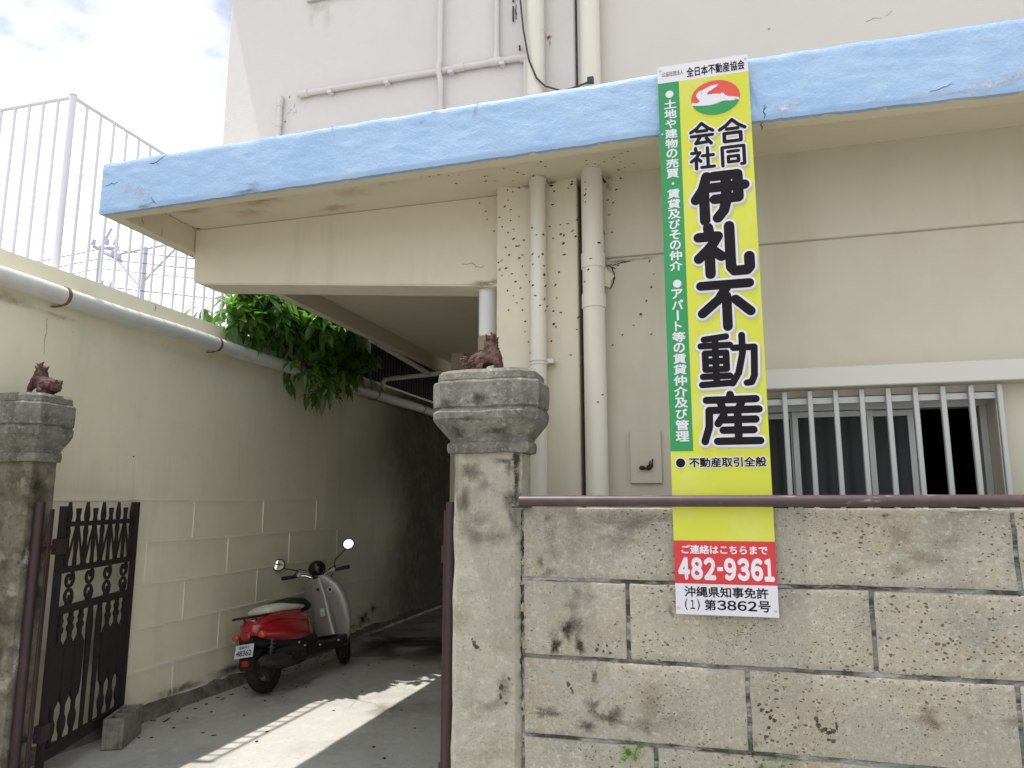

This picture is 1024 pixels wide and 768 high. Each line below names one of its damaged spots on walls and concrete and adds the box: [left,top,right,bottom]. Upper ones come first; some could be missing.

crack [605,261,630,289]
damp [502,453,520,524]
damp [552,622,583,654]